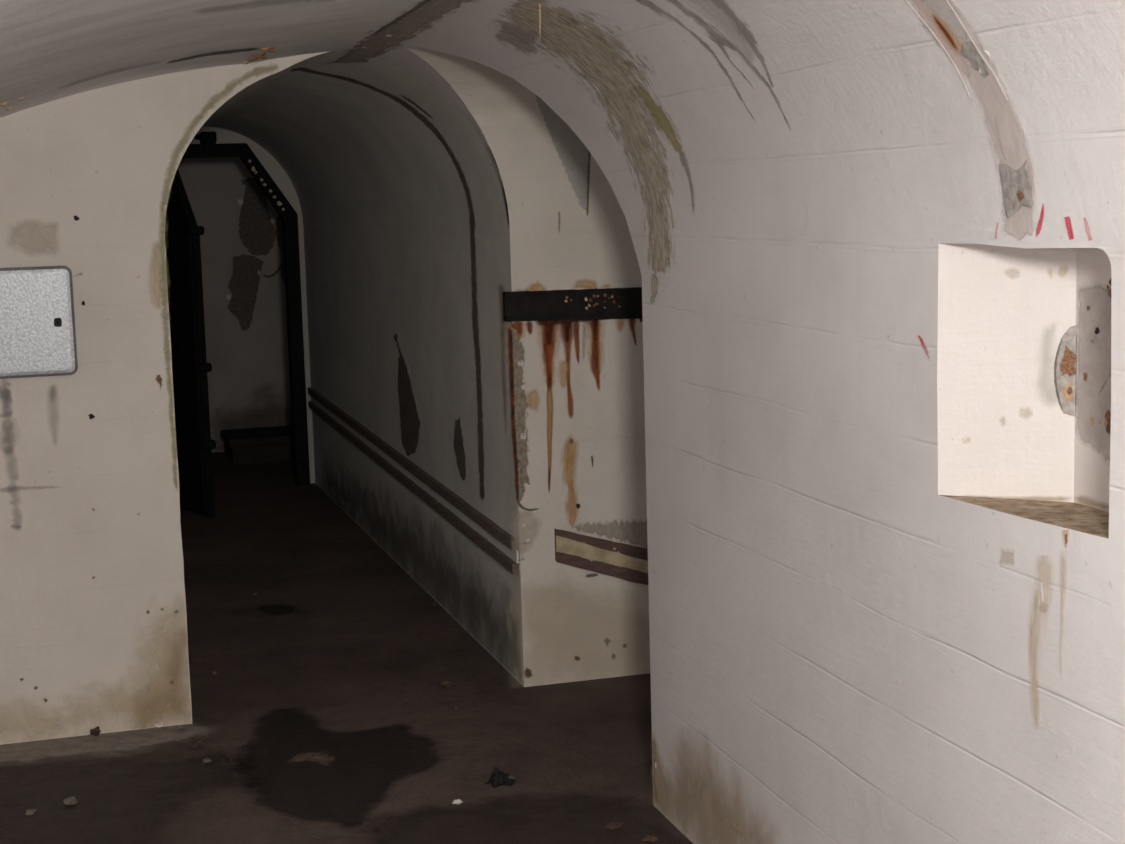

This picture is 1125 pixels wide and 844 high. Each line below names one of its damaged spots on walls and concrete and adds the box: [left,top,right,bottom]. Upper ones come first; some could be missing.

peeling [905,0,1034,239]
spalling [507,323,538,557]
rust [513,320,600,524]
rust [618,319,643,345]
spalling [1054,326,1077,416]